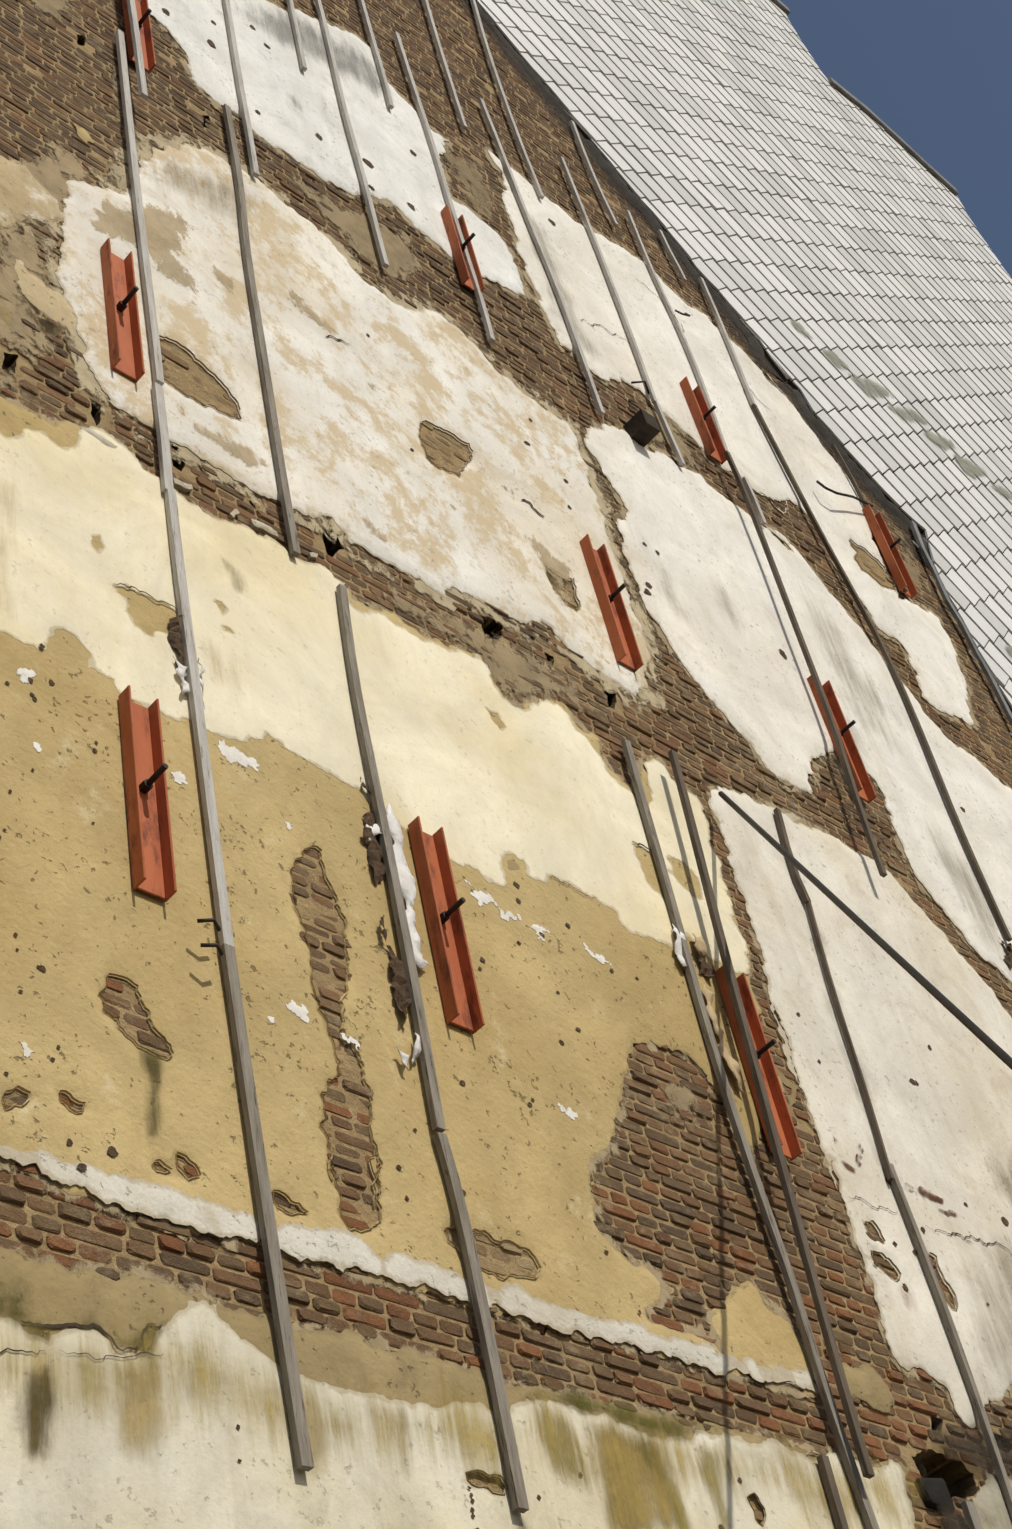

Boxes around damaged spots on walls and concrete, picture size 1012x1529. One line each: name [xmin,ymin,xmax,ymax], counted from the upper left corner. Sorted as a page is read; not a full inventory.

flaking render [0,105,979,878]
flaking render [0,629,1012,1529]
crack [852,1196,1012,1254]
water stain [27,1361,52,1454]
water stain [443,1406,496,1462]
water stain [540,1410,689,1529]
water stain [703,1451,732,1527]
water stain [784,1462,857,1510]